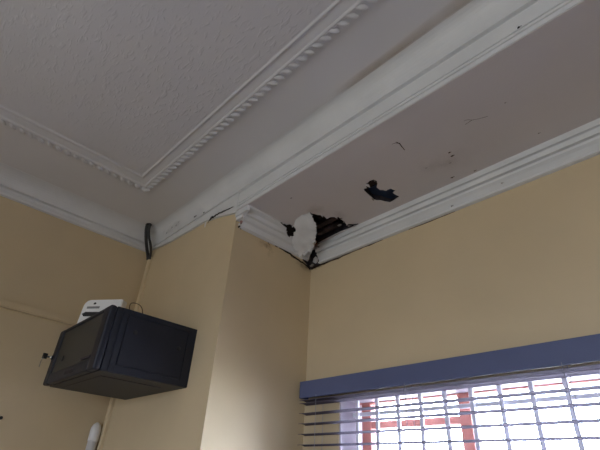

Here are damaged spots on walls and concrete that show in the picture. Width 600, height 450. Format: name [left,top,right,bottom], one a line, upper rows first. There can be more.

spalling [363,179,399,202]
peeling [280,212,354,269]